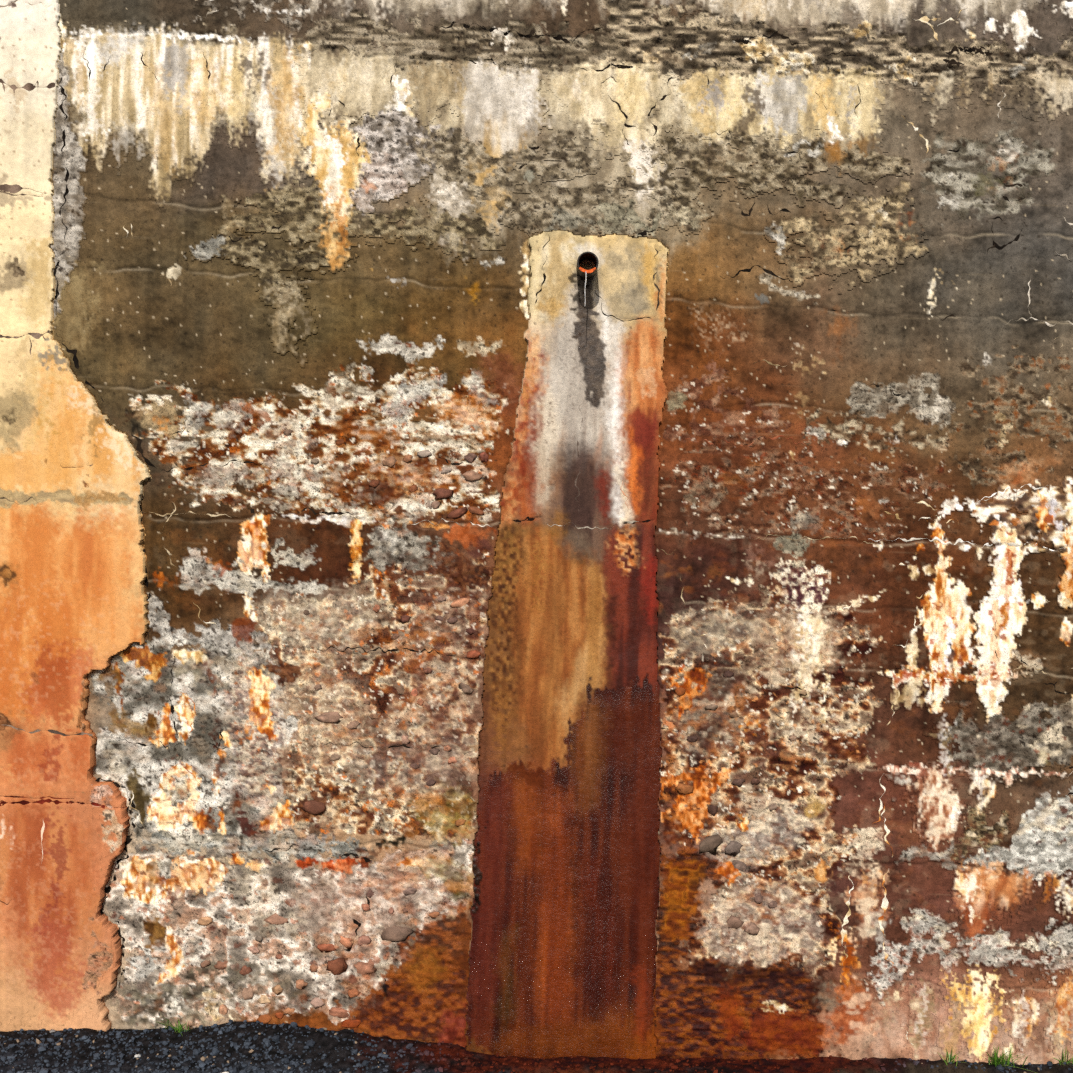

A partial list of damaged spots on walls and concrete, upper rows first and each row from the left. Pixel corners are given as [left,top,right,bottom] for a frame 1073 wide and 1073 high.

spalling [160,179,329,308]
water stain [283,0,570,27]
water stain [64,12,1073,476]
corrosion [0,329,268,1030]
corrosion [187,708,297,838]
spalling [72,331,511,1030]
corrosion [404,242,718,766]
spalling [347,106,1073,978]
corrosion [653,754,902,1060]
water stain [658,466,1073,947]
water stain [878,873,894,966]